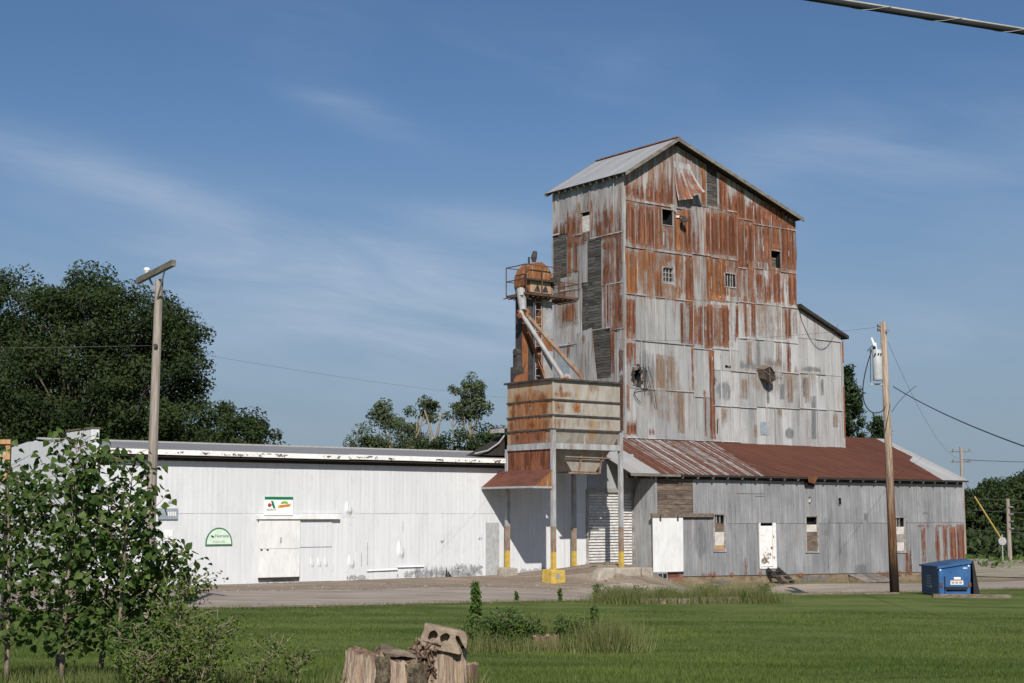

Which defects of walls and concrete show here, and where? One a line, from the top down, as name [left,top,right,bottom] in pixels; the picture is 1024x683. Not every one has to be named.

rust [510,319,580,470]
rust [553,165,942,480]
rust [881,524,965,576]